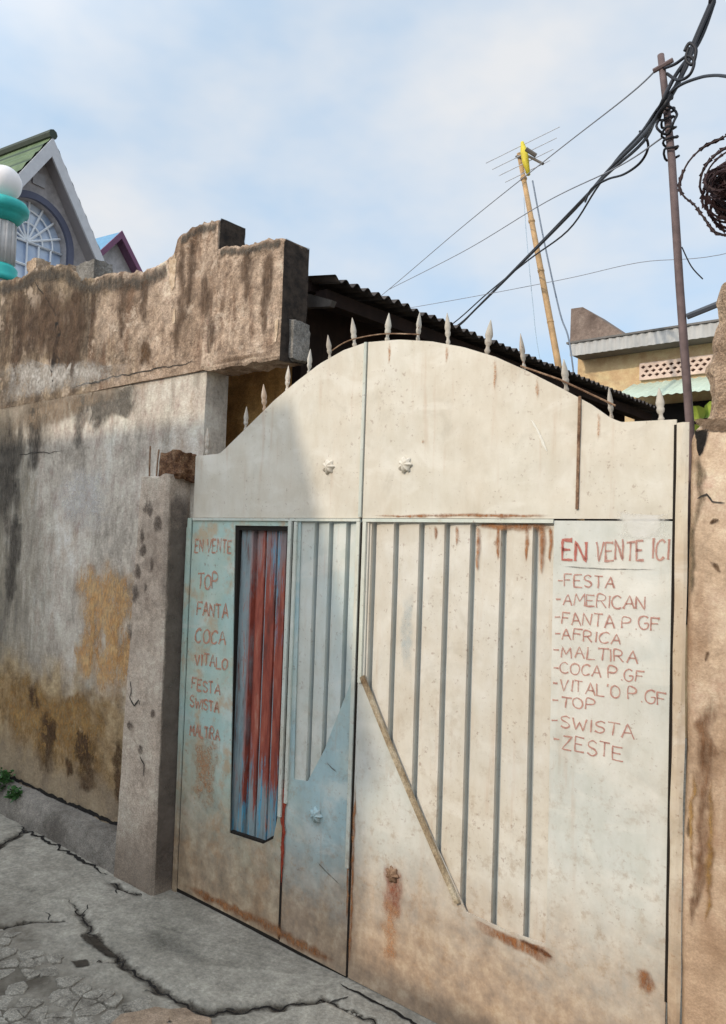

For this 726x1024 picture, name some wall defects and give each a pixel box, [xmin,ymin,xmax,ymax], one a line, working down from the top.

damp [0,218,310,375]
crack [35,282,196,423]
spalling [149,446,196,483]
rust [385,514,553,571]
damp [0,677,122,799]
damp [688,714,714,915]
crack [1,826,117,893]
rust [194,889,326,960]
rust [488,927,551,958]